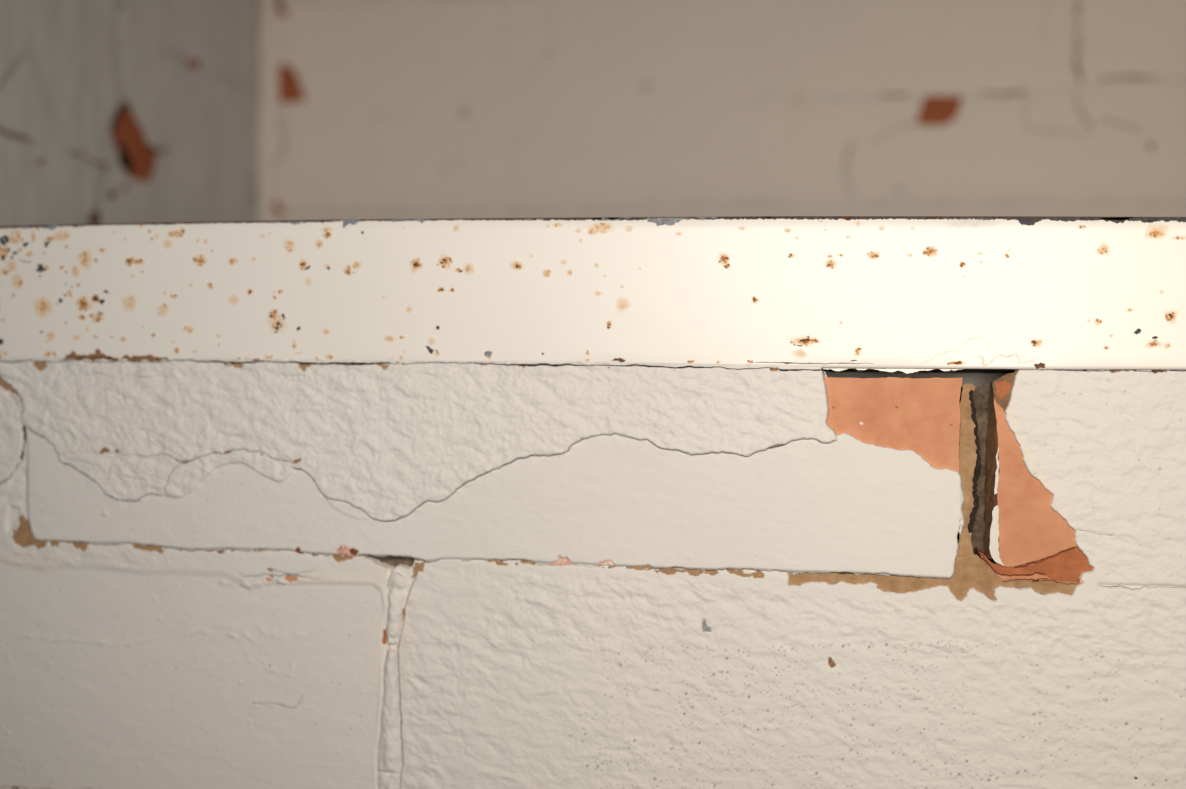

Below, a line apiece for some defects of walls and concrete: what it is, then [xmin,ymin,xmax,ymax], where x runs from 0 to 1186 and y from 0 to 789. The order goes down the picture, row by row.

spalling [917,95,962,126]
spalling [107,101,169,198]
corrosion [0,228,110,323]
corrosion [437,257,472,272]
corrosion [269,290,285,333]
crack [0,360,874,522]
spalling [788,370,1093,601]
peeling [11,515,59,549]
crack [30,528,378,580]
spalling [333,546,425,578]
crack [416,559,917,578]
peeling [602,565,764,578]